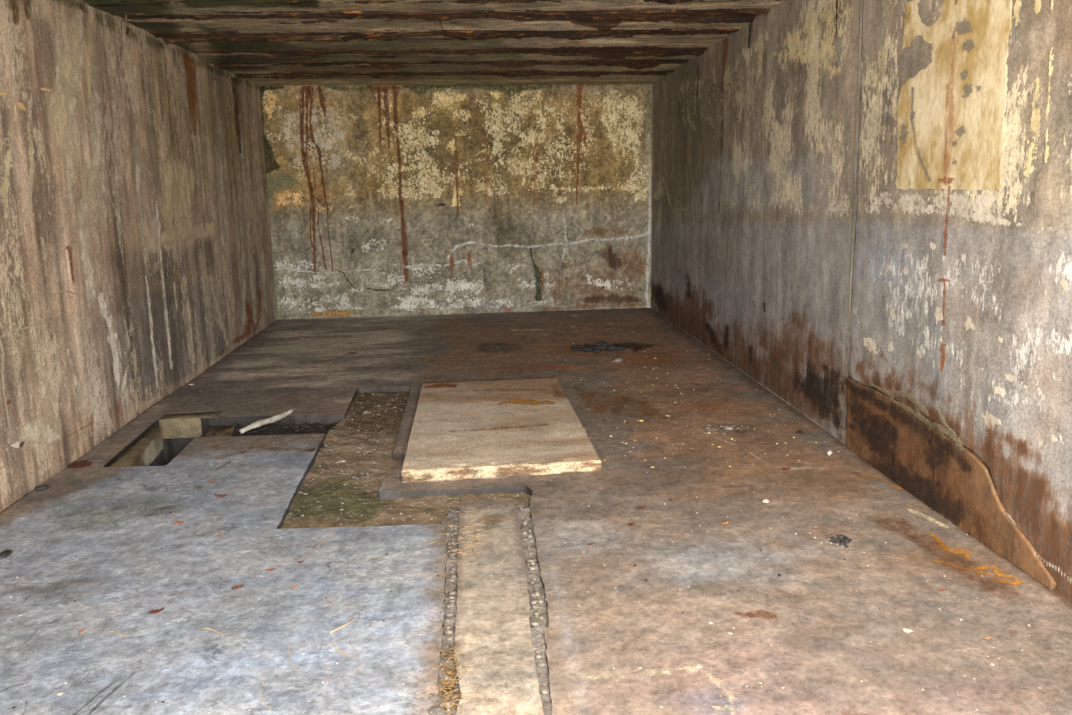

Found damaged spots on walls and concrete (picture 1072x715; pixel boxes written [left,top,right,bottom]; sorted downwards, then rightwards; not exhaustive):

rust [299,85,333,275]
rust [369,85,408,281]
damp [406,134,652,306]
peeling [373,90,693,211]
rust [576,84,586,204]
rust [580,46,627,63]
peeling [677,0,854,133]
peeling [812,37,1054,231]
rust [939,177,953,255]
peeling [952,17,975,53]
peeling [1023,47,1072,178]
damp [908,509,1022,585]